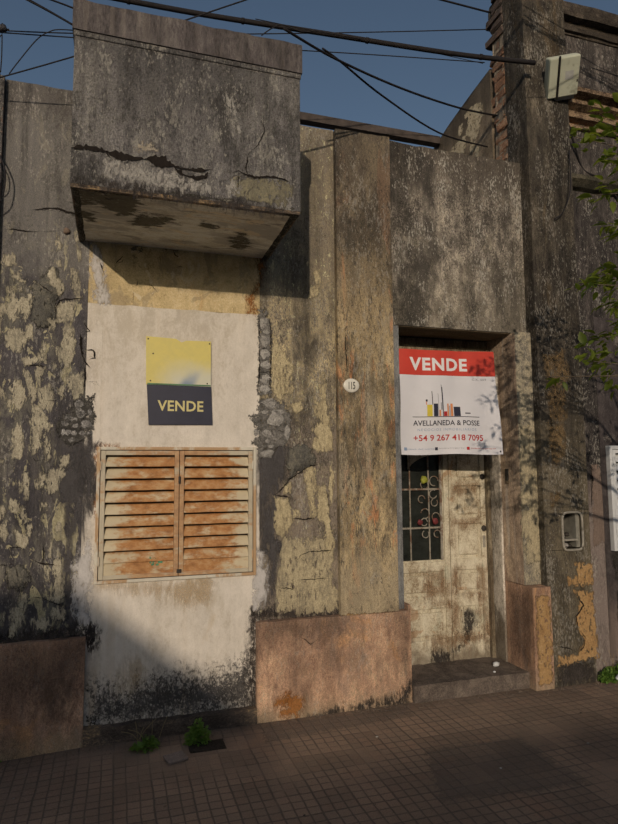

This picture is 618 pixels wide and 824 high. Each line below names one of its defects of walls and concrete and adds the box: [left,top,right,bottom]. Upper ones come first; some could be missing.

crack [4,207,74,234]
crack [70,114,292,194]
damp [74,140,294,229]
damp [225,232,250,250]
peeling [0,230,110,550]
spalling [248,309,333,460]
crack [1,547,64,613]
peeling [0,522,94,639]
damp [85,445,339,725]
peeling [252,466,393,617]
peeling [535,561,601,687]
corrosion [274,690,304,719]